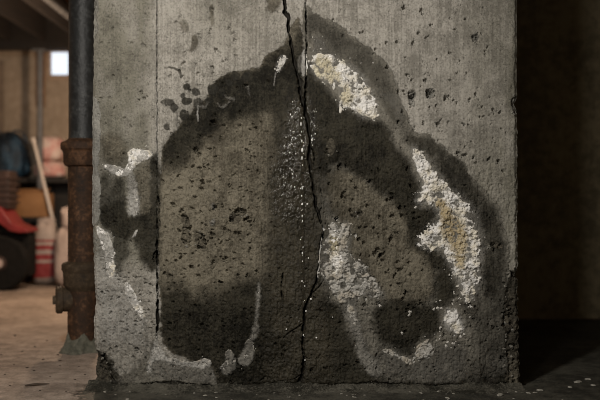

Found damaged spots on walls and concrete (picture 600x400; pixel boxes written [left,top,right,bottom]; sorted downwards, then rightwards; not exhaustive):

leakage [96,6,509,385]
crack [282,0,324,382]
leakage [74,319,600,400]